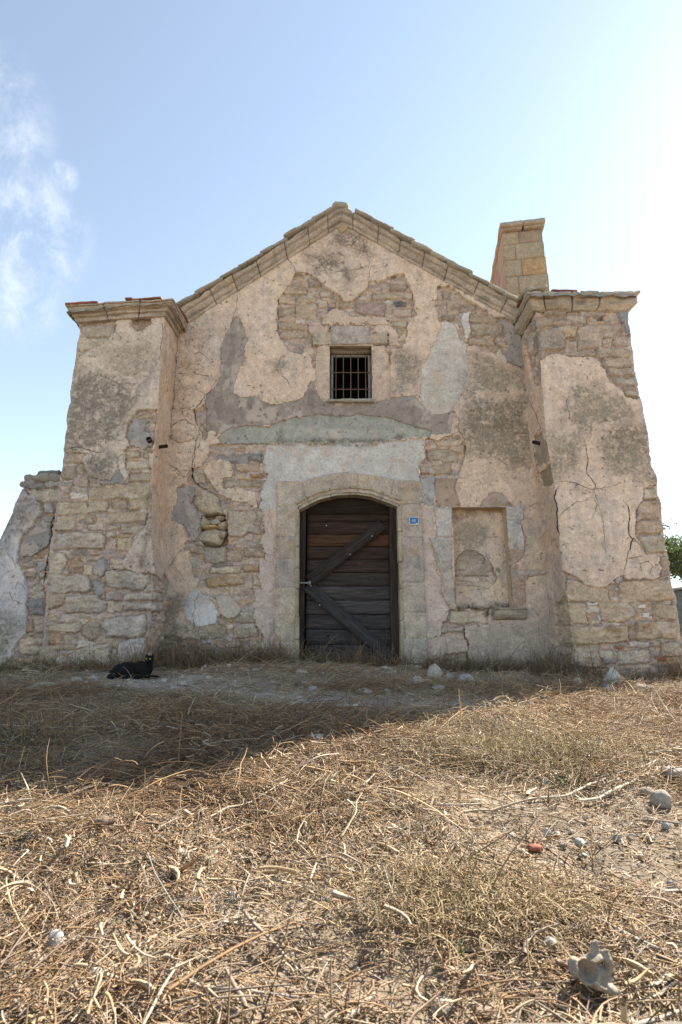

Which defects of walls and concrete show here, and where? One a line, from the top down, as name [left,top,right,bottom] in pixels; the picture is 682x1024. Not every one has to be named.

crack [160,320,217,494]
spalling [3,274,640,669]
crack [447,382,653,576]
spalling [556,486,682,679]